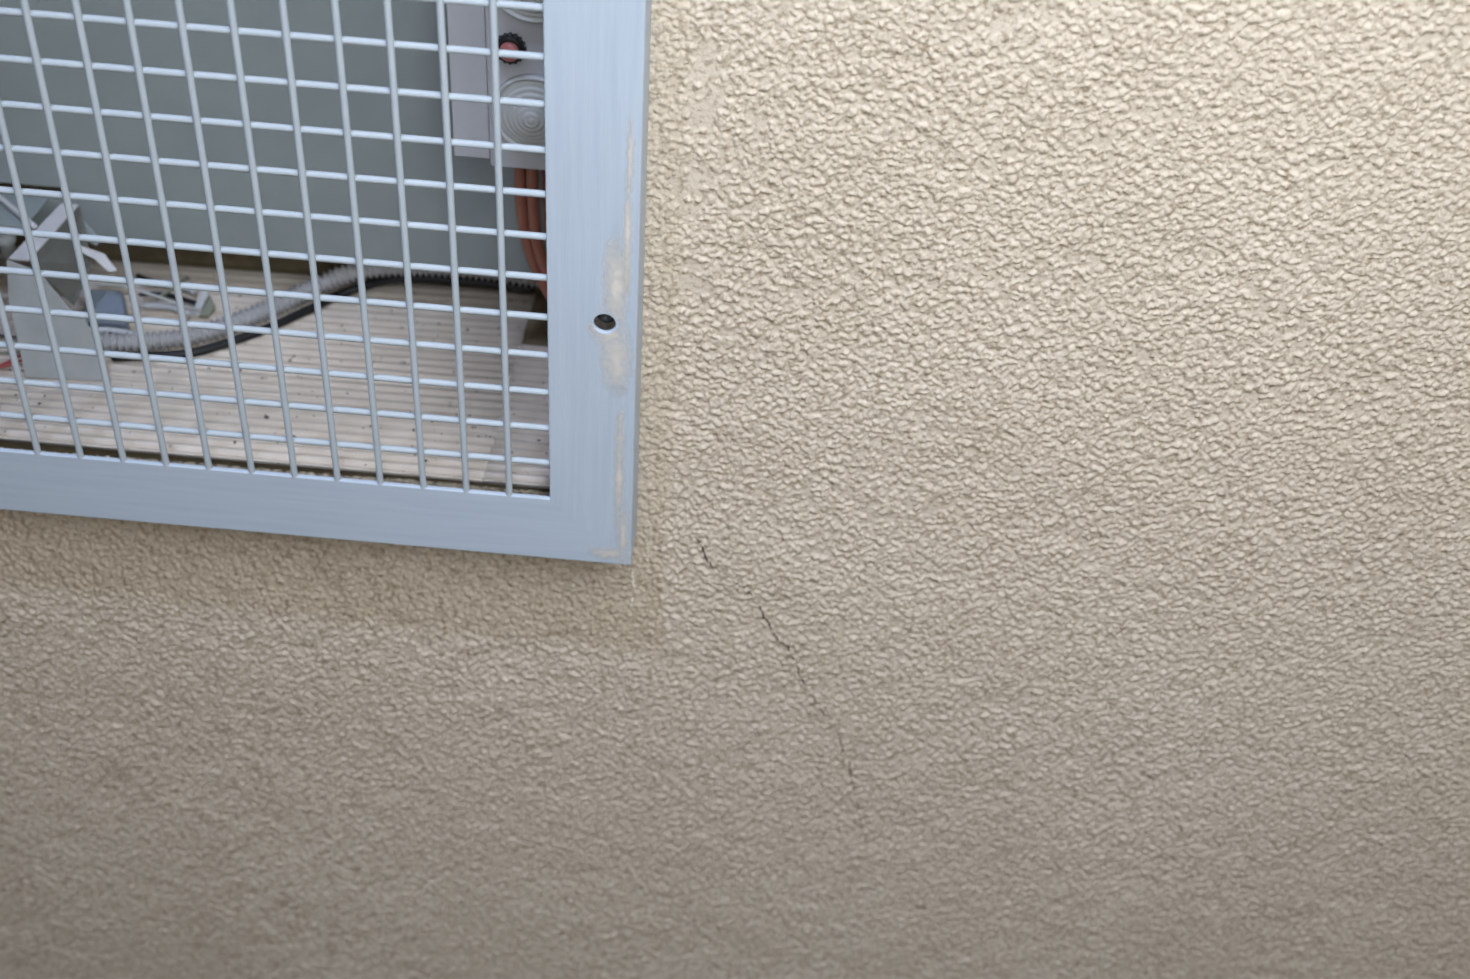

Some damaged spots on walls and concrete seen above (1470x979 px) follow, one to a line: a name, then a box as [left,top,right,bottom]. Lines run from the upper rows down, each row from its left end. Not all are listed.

crack [696,538,867,844]